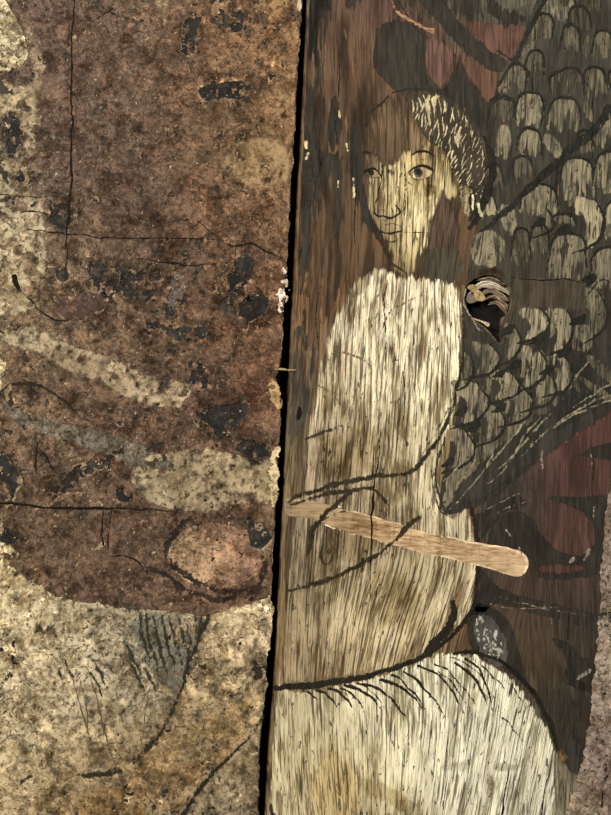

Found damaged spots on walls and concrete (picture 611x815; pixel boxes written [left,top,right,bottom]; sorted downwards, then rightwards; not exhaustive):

peeling [180,0,254,56]
peeling [199,80,257,104]
crack [0,0,282,270]
peeling [218,249,290,327]
peeling [195,398,281,507]